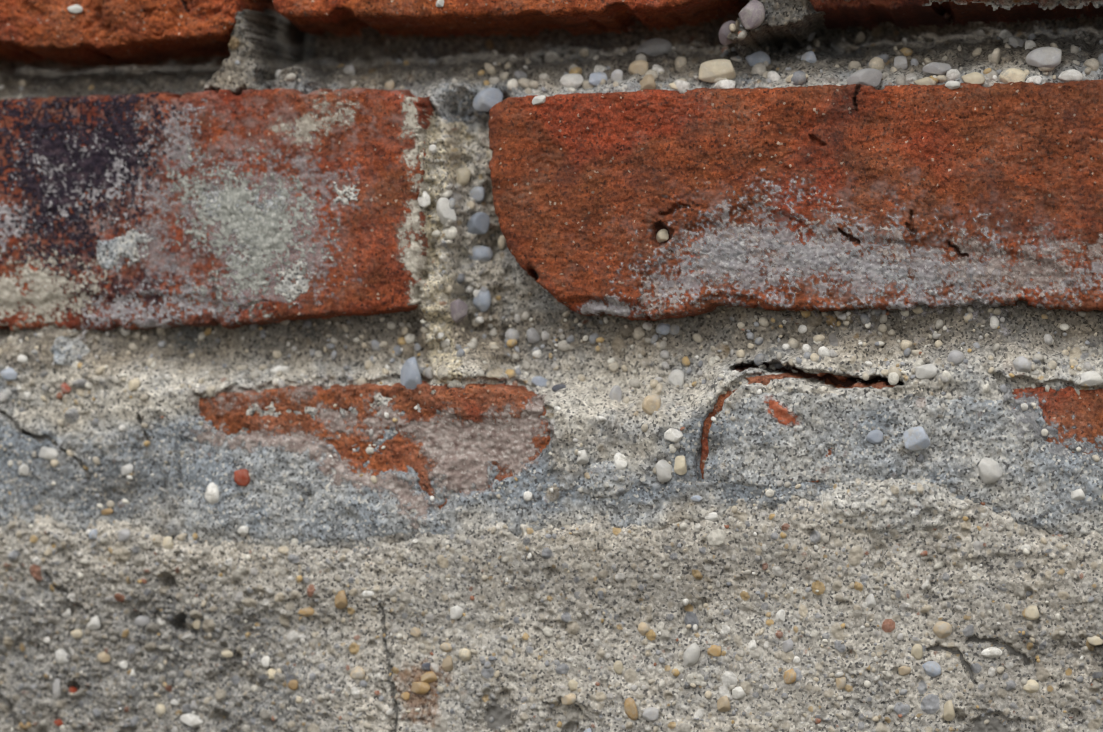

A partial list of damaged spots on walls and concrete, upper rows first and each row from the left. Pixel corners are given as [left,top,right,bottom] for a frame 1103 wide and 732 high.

crack [838,228,860,244]
crack [948,241,969,257]
crack [732,363,903,387]
peeling [316,391,420,442]